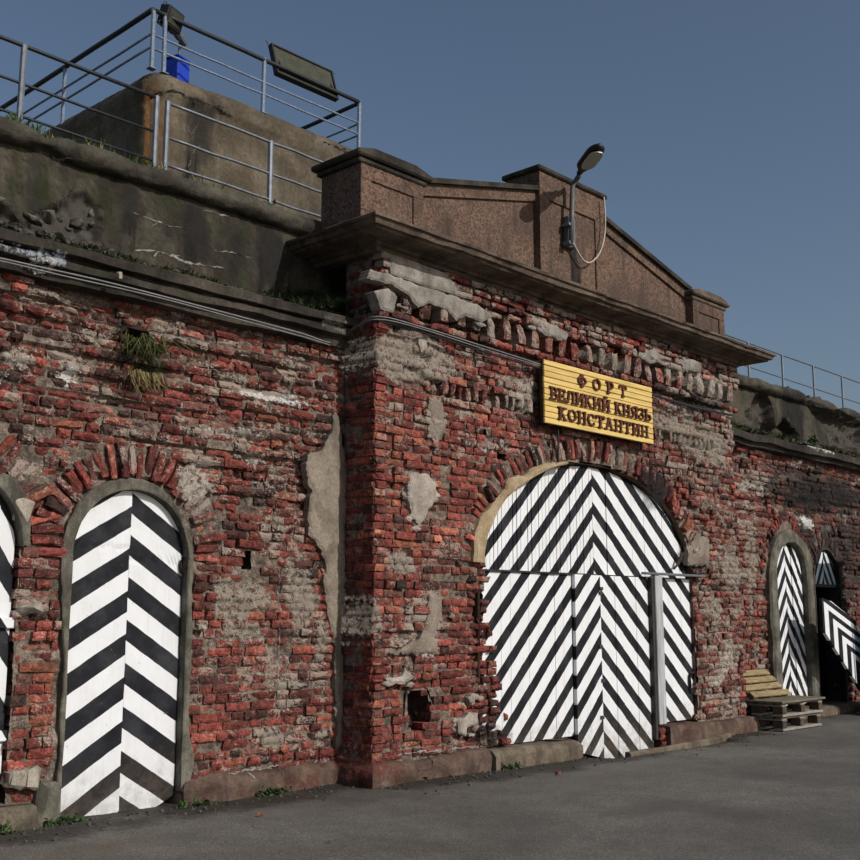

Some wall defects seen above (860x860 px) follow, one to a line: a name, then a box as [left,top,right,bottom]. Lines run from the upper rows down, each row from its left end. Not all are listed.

peeling [358,254,492,327]
peeling [525,318,568,341]
hole [241,550,251,570]